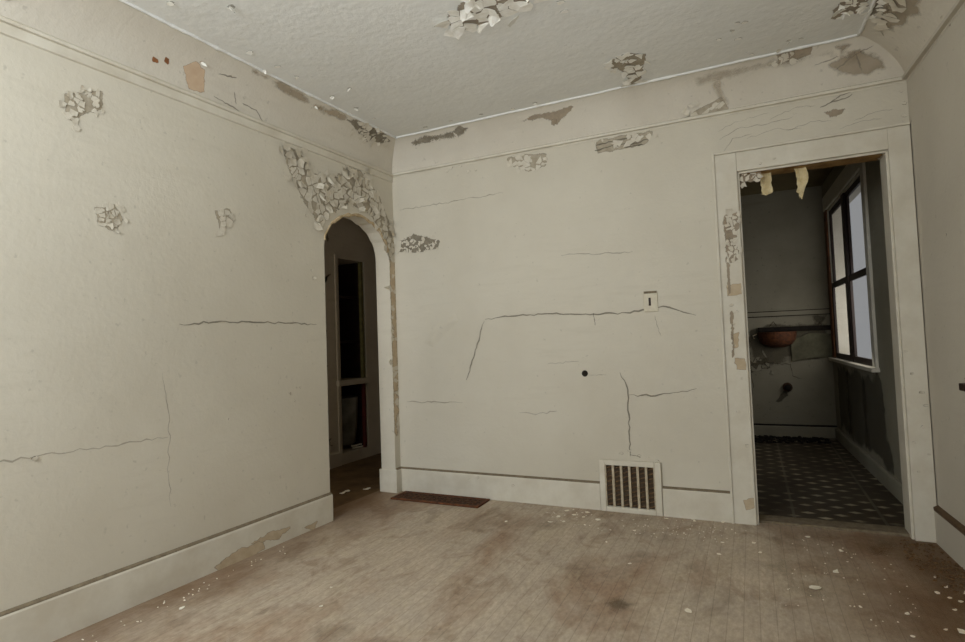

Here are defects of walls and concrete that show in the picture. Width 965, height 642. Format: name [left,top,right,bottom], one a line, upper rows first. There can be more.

peeling [434,0,548,40]
peeling [831,0,906,36]
peeling [602,52,651,87]
flaking render [830,45,883,74]
peeling [59,85,104,131]
peeling [590,131,658,153]
peeling [794,167,809,199]
peeling [723,208,742,263]
peeling [279,140,440,436]